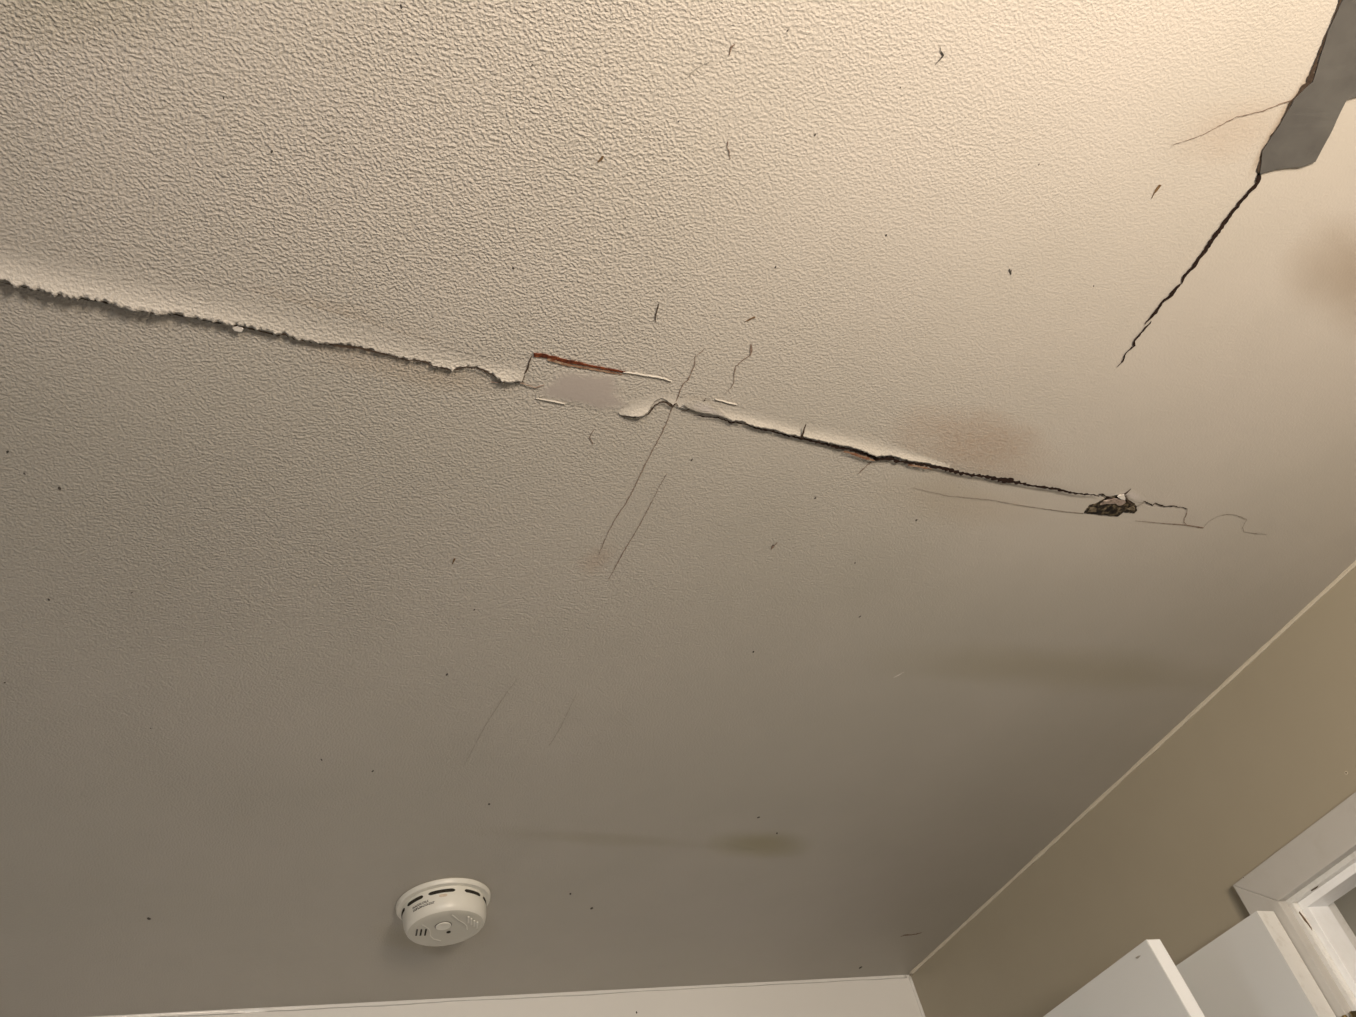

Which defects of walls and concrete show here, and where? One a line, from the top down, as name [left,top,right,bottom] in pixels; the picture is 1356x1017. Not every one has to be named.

crack [1117,0,1342,367]
peeling [0,239,531,384]
crack [589,344,1099,580]